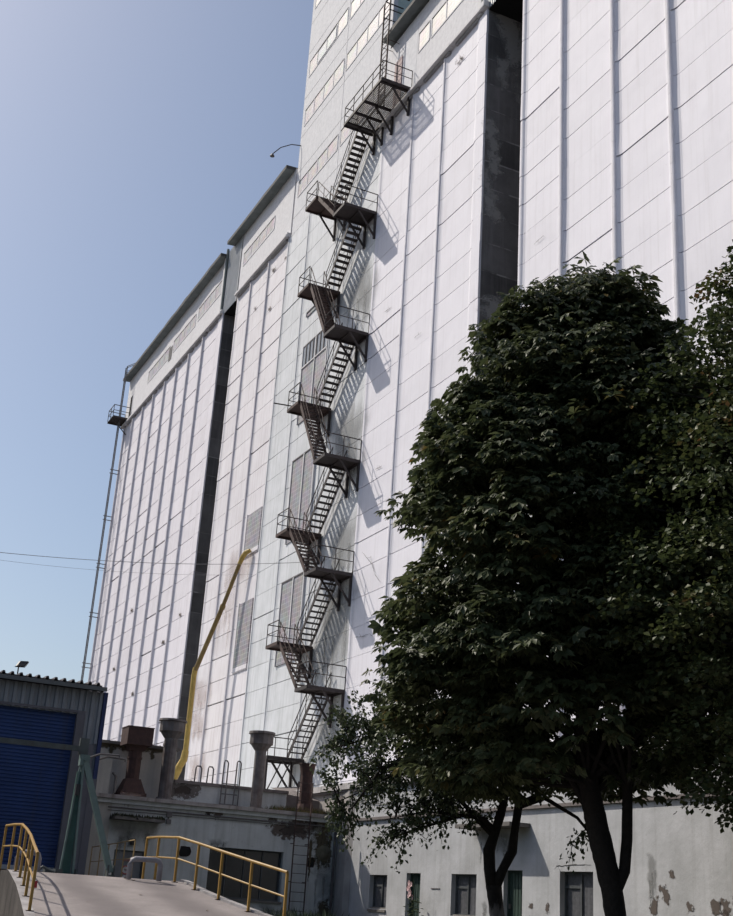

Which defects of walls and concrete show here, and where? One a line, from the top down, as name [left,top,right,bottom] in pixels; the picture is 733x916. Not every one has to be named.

damp [496,15,522,88]
damp [484,119,501,221]
flaking render [265,817,318,840]
flaking render [649,869,675,915]
flaking render [710,897,733,916]